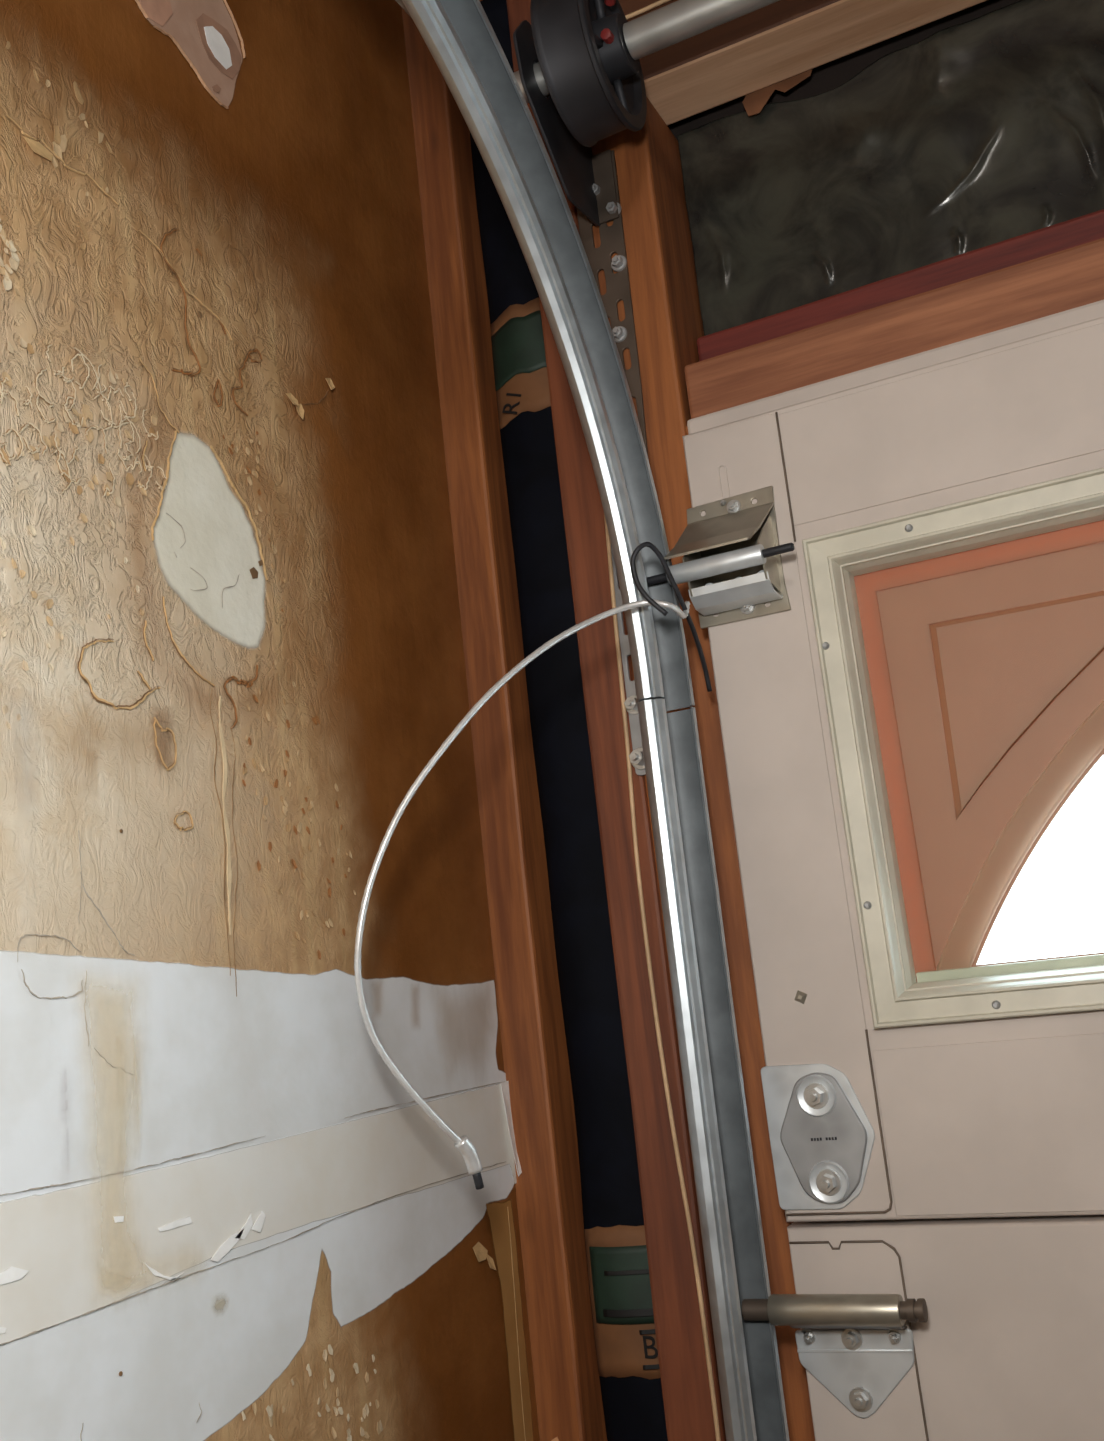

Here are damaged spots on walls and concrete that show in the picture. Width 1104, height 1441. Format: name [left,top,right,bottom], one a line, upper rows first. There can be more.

spalling [135,0,246,109]
peeling [24,126,67,168]
peeling [73,81,113,161]
peeling [0,219,20,296]
spalling [0,338,285,648]
crack [77,596,258,997]
water stain [97,997,131,1285]